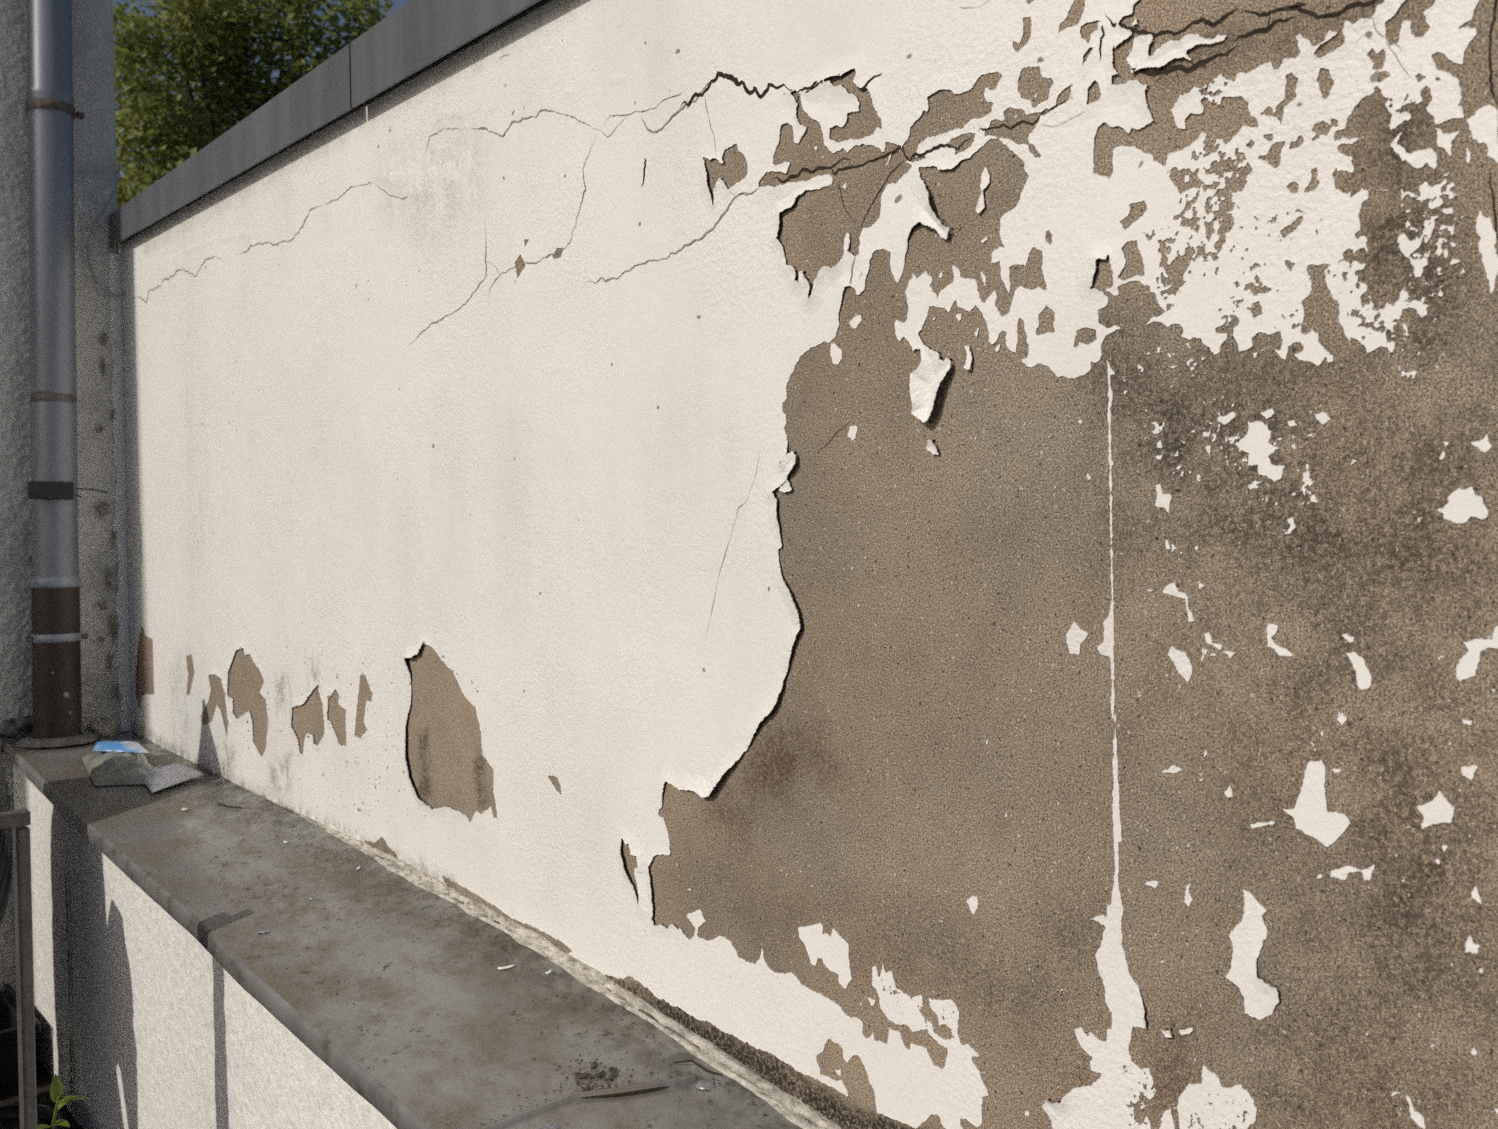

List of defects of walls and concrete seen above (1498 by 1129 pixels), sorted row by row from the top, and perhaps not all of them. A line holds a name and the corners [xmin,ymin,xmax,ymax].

crack [131,182,408,303]
crack [408,69,882,345]
crack [584,99,1084,284]
crack [1099,0,1411,84]
crack [1488,0,1498,241]
peeling [606,0,1498,1129]
peeling [187,648,373,763]
peeling [398,644,497,822]